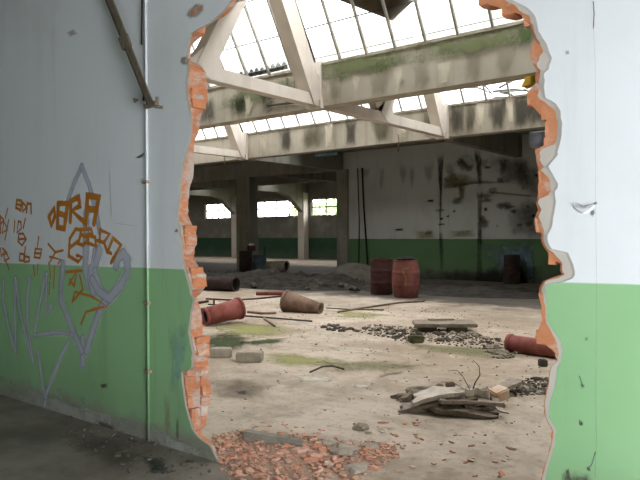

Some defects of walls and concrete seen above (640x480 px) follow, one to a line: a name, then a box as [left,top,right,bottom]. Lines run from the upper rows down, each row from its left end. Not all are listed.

damp [232,99,252,114]
damp [282,131,290,148]
damp [304,126,332,147]
damp [346,122,355,144]
damp [373,122,388,138]
spalling [175,0,237,462]
spalling [478,0,575,480]